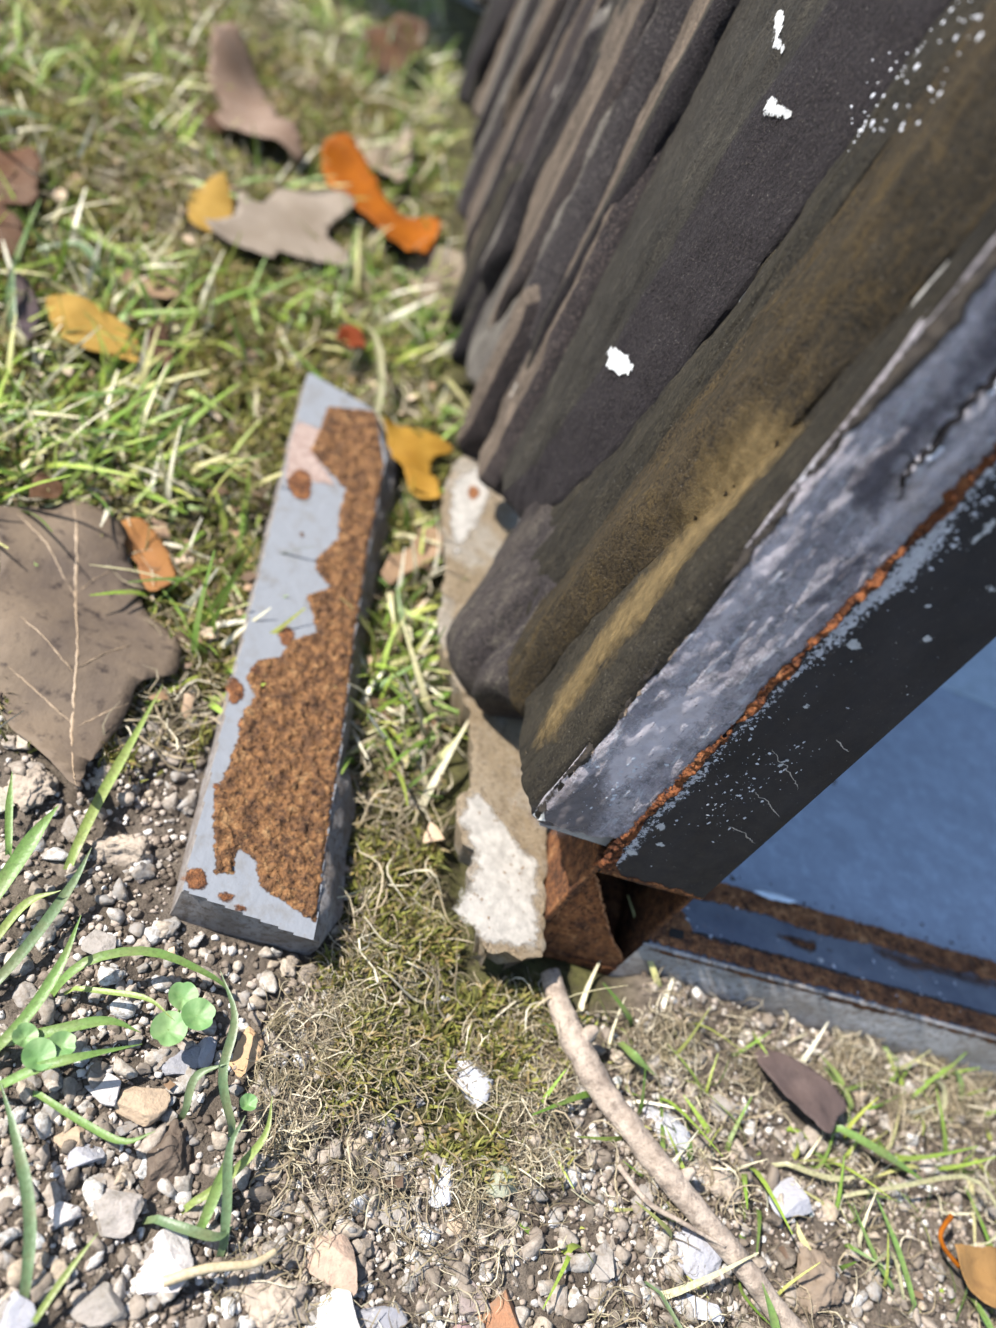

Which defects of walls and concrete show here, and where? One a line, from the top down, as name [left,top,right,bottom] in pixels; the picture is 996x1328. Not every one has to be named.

peeling [285,422,334,485]
crack [895,370,996,502]
damp [541,295,996,833]
corrosion [592,443,996,1045]
peeling [753,889,798,903]